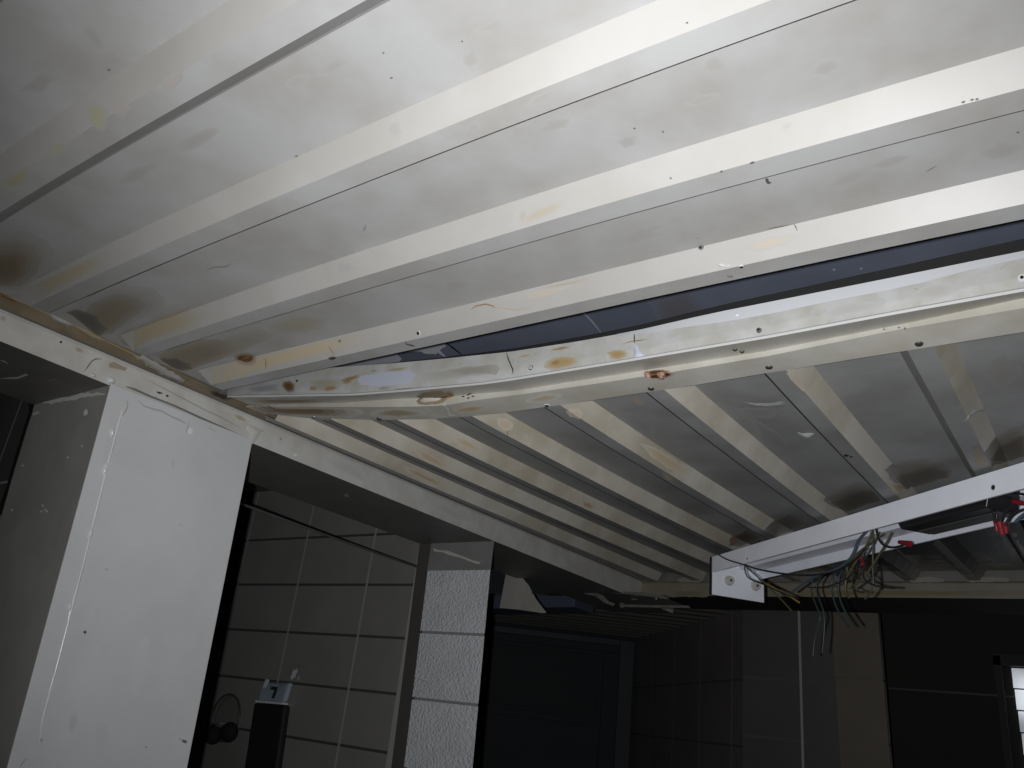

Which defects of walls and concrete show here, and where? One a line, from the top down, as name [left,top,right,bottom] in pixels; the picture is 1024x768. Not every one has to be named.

leakage [0,231,111,302]
leakage [69,284,427,423]
corrosion [234,353,266,370]
corrosion [544,346,579,370]
corrosion [642,369,676,380]
leakage [888,460,948,488]
leakage [827,485,880,512]